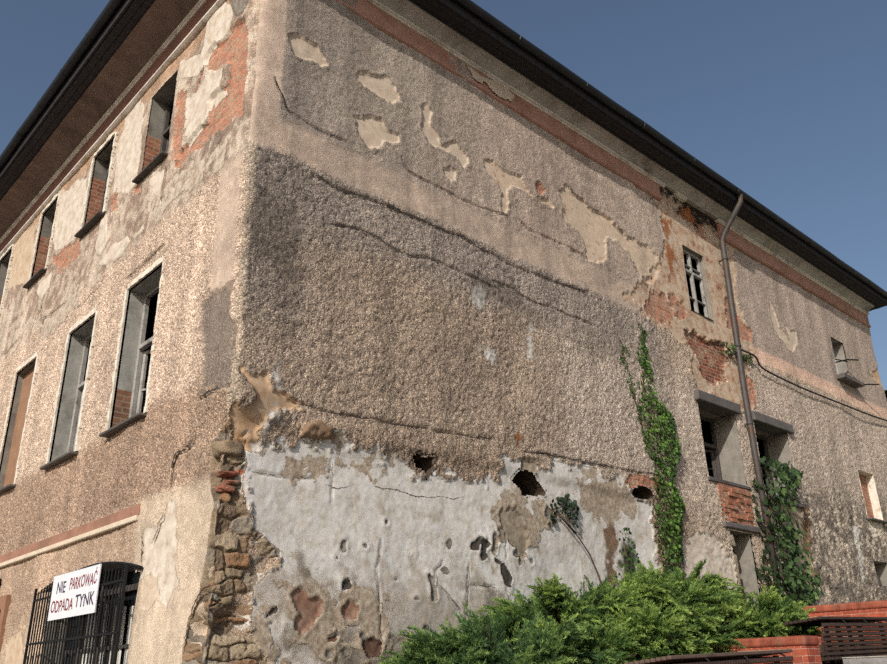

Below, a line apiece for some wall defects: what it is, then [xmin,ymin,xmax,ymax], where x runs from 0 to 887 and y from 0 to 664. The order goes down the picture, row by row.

flaking render [171,19,248,168]
flaking render [288,33,329,67]
flaking render [353,115,400,149]
flaking render [356,70,400,104]
flaking render [421,103,470,182]
crack [404,161,503,213]
flaking render [36,238,81,299]
peeling [95,189,144,266]
crack [316,174,593,324]
flaking render [484,159,757,411]
crack [372,485,466,499]
flaking render [181,289,664,664]